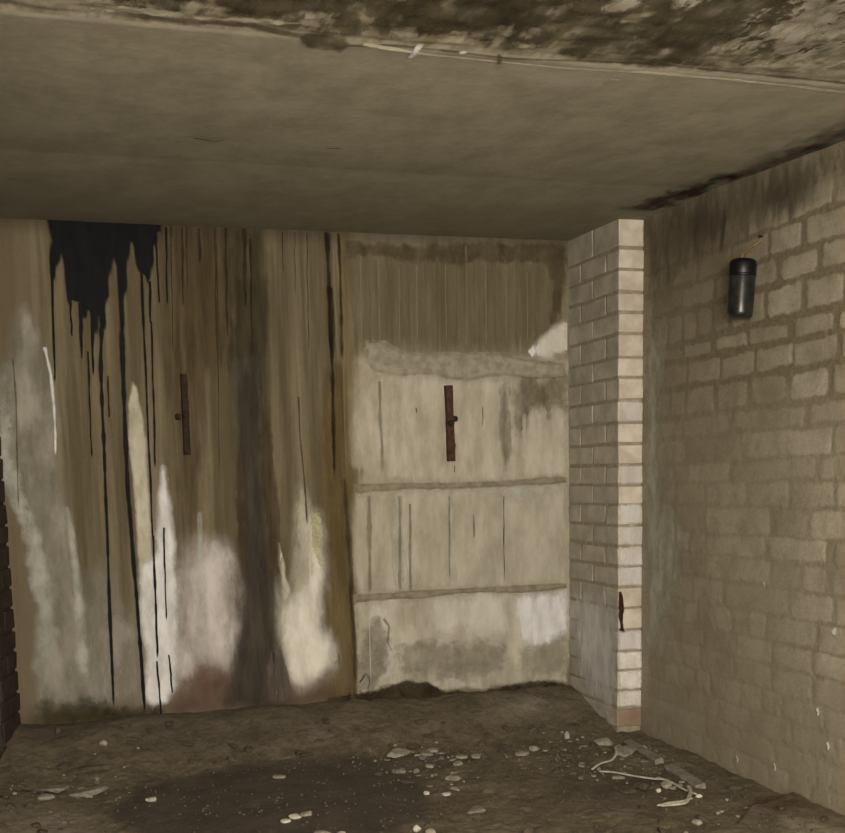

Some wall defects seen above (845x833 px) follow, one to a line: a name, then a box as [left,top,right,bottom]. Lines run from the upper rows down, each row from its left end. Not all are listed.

water stain [223,0,845,74]
water stain [641,131,845,209]
water stain [0,220,333,714]